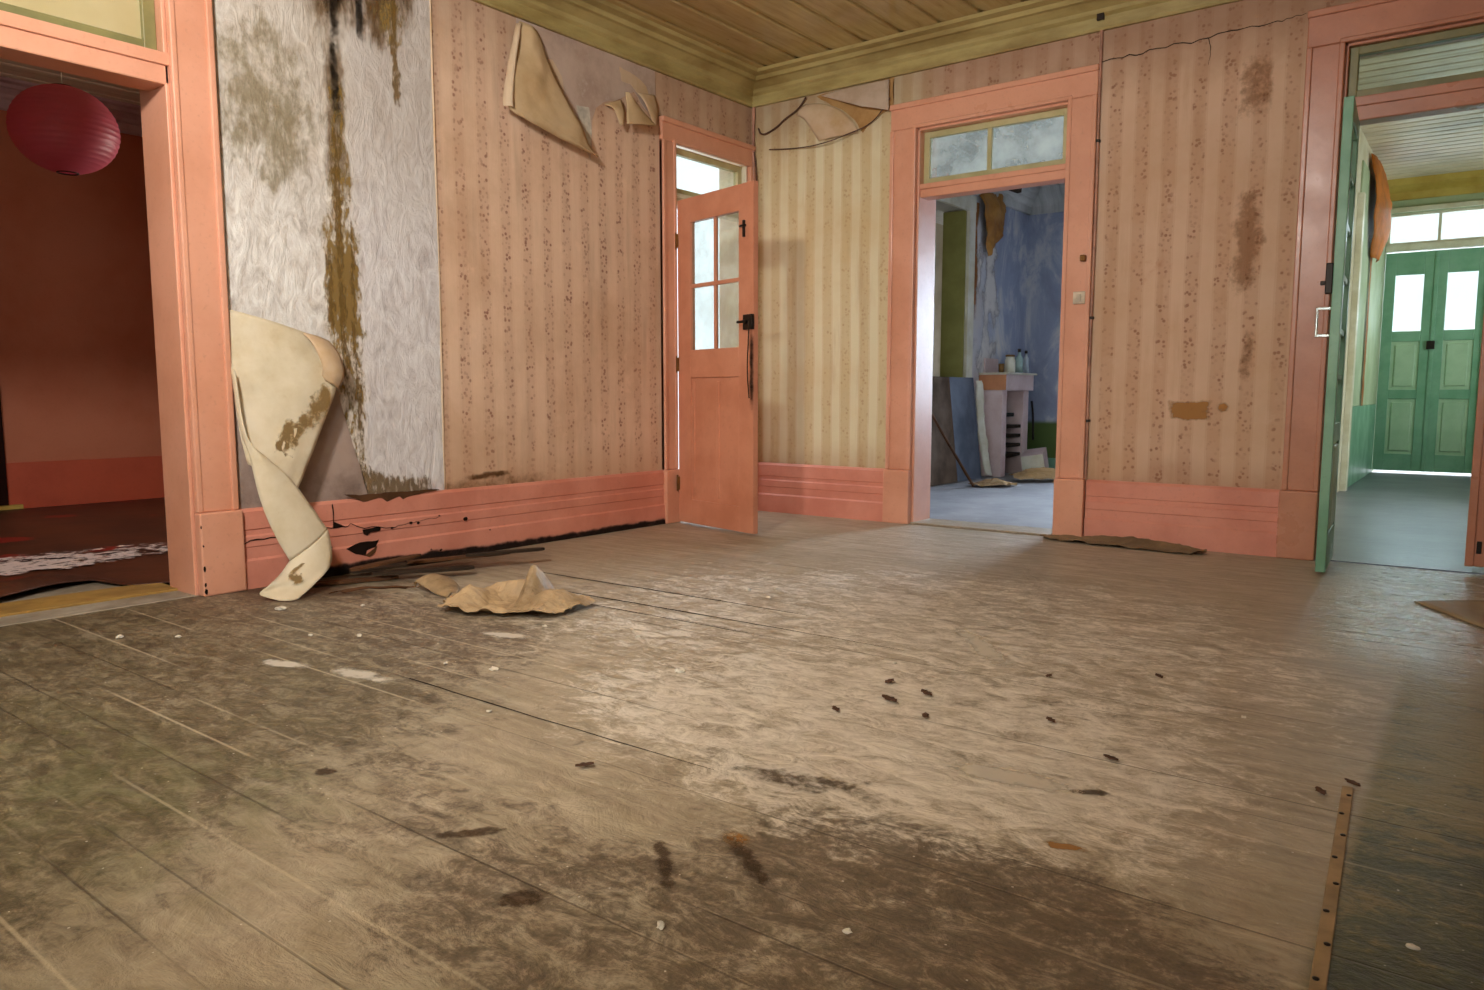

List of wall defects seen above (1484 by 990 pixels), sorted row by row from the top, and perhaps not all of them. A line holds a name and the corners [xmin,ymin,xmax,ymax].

water stain [230,42,299,190]
water stain [315,0,412,183]
flaking render [503,18,658,159]
peeling [817,77,894,132]
flaking render [212,0,445,601]
water stain [360,463,514,494]